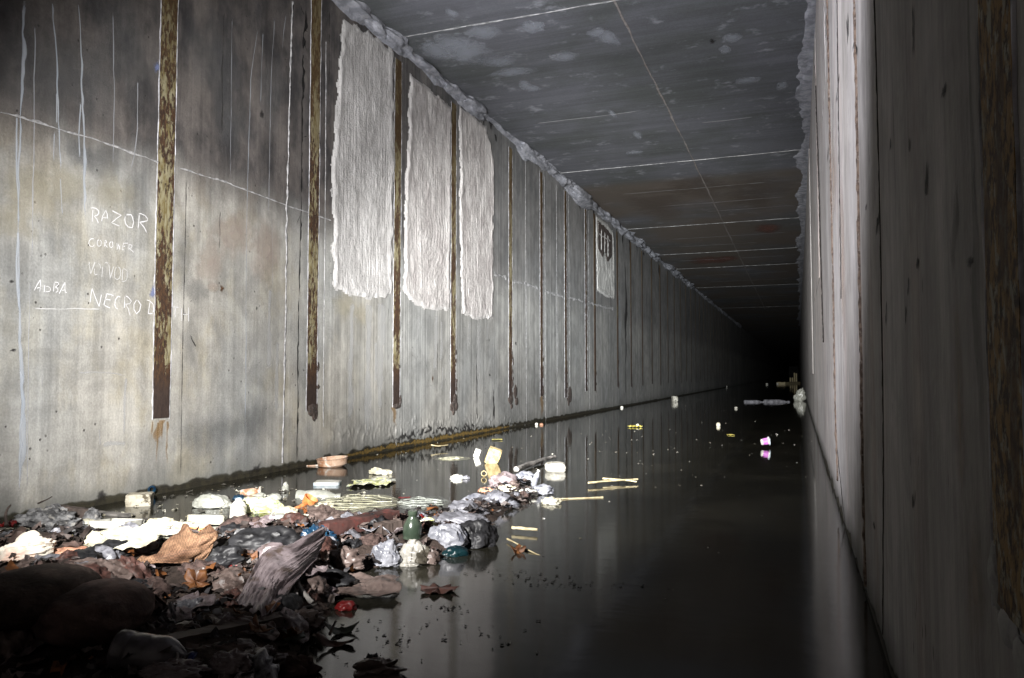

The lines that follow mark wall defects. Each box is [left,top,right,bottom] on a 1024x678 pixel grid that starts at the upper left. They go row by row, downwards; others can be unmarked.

spalling [598,221,612,262]
rust [152,420,169,450]